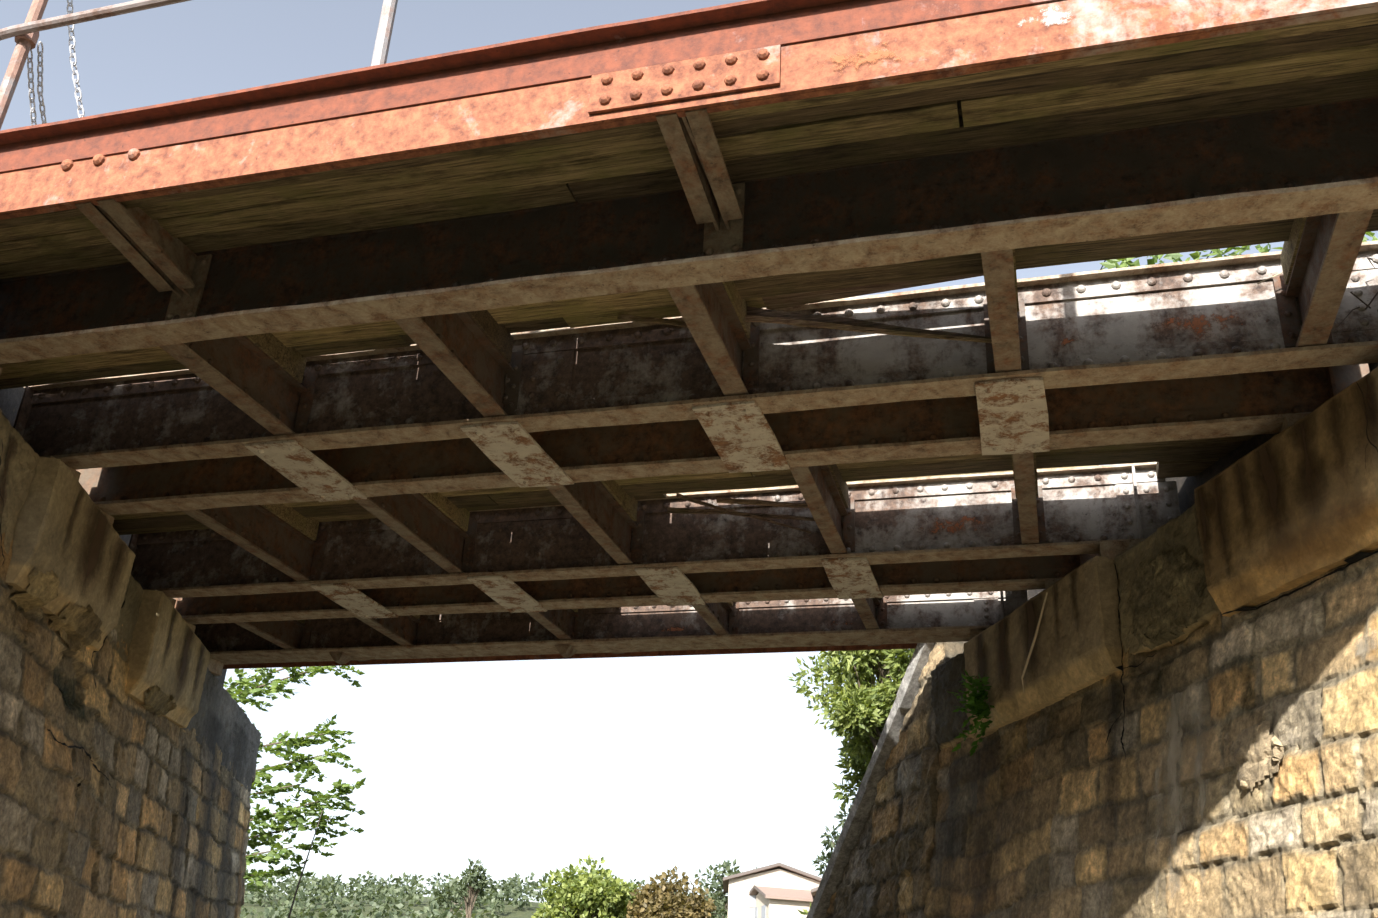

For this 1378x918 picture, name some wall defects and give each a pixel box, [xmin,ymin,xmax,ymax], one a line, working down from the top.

rust [1152,306,1243,341]
crack [1221,550,1378,616]